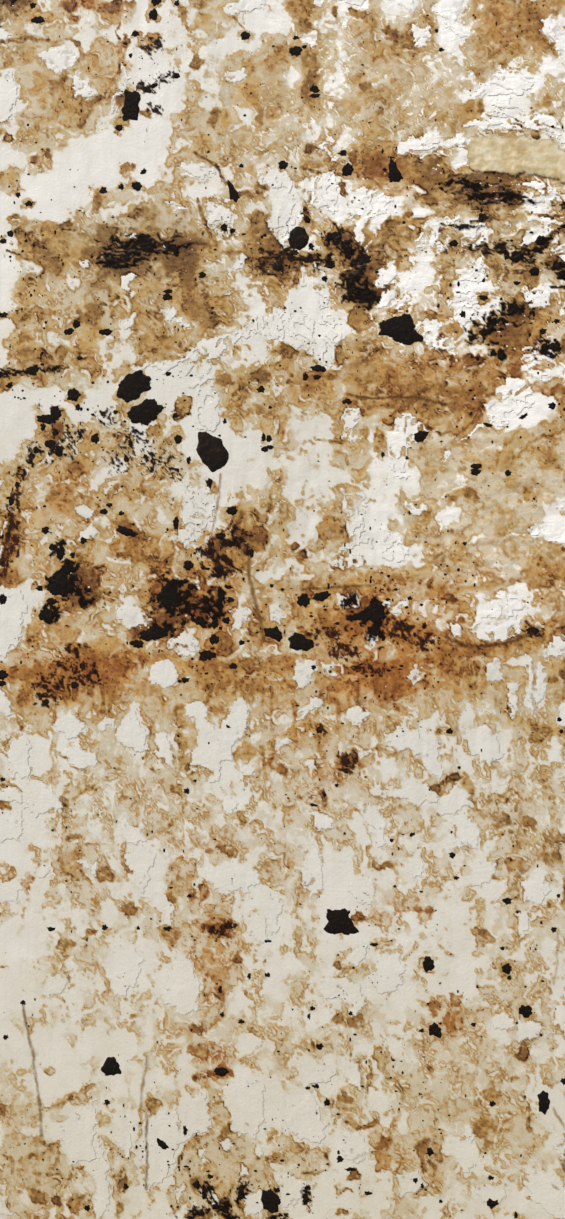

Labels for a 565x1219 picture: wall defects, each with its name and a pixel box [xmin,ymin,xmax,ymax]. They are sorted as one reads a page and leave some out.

rust [0,0,565,881]
rust [0,800,302,1219]
water stain [274,1092,344,1208]
rust [323,845,446,1000]
rust [303,946,565,1219]